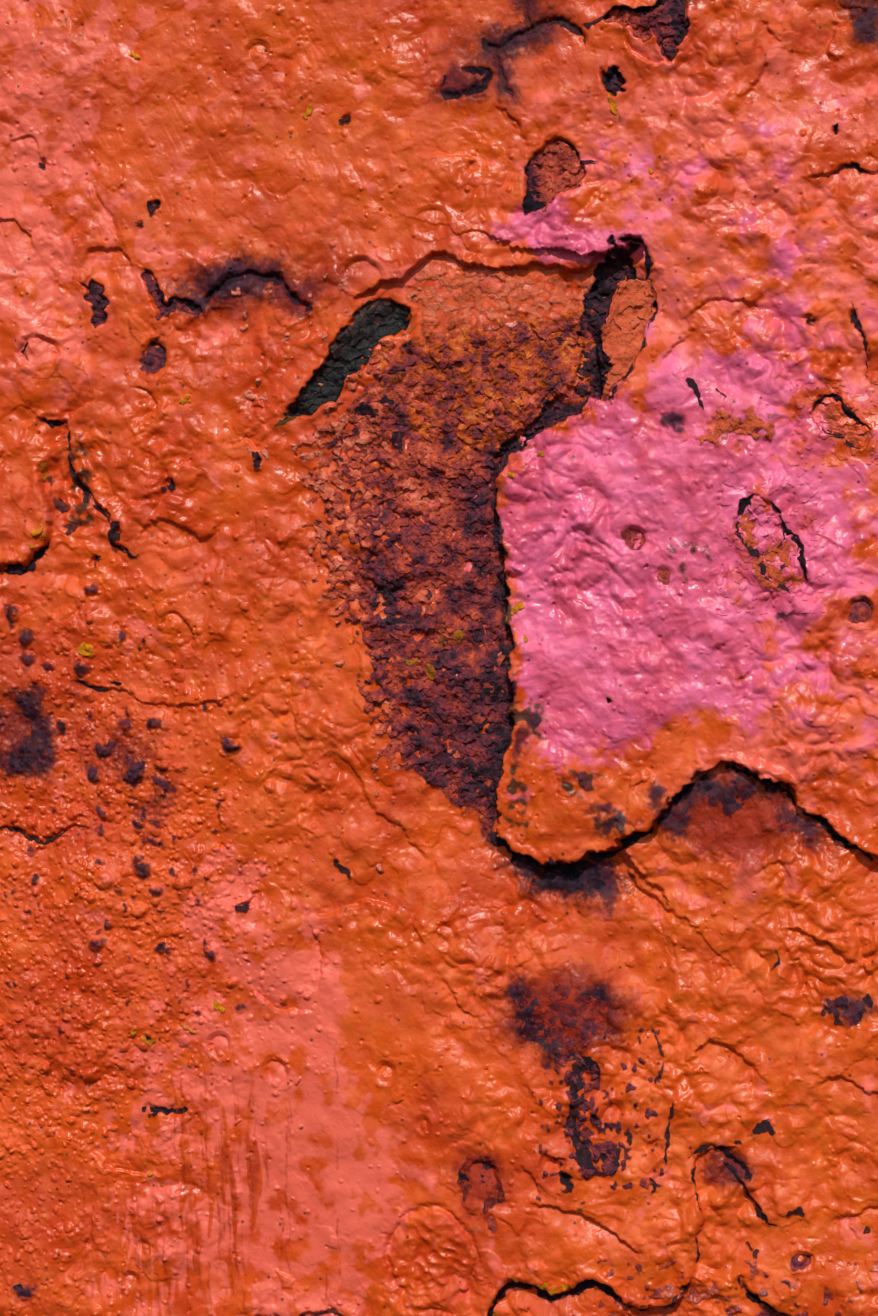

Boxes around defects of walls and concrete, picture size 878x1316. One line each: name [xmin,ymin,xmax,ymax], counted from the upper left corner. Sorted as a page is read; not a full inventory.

crack [435,0,606,100]
crack [175,255,322,317]
spalling [340,253,391,301]
crack [0,419,140,575]
rust [0,684,56,776]
crack [490,764,873,896]
rust [501,970,674,1204]
rust [595,1241,808,1316]
crack [737,1277,785,1316]
rust [823,1261,878,1316]